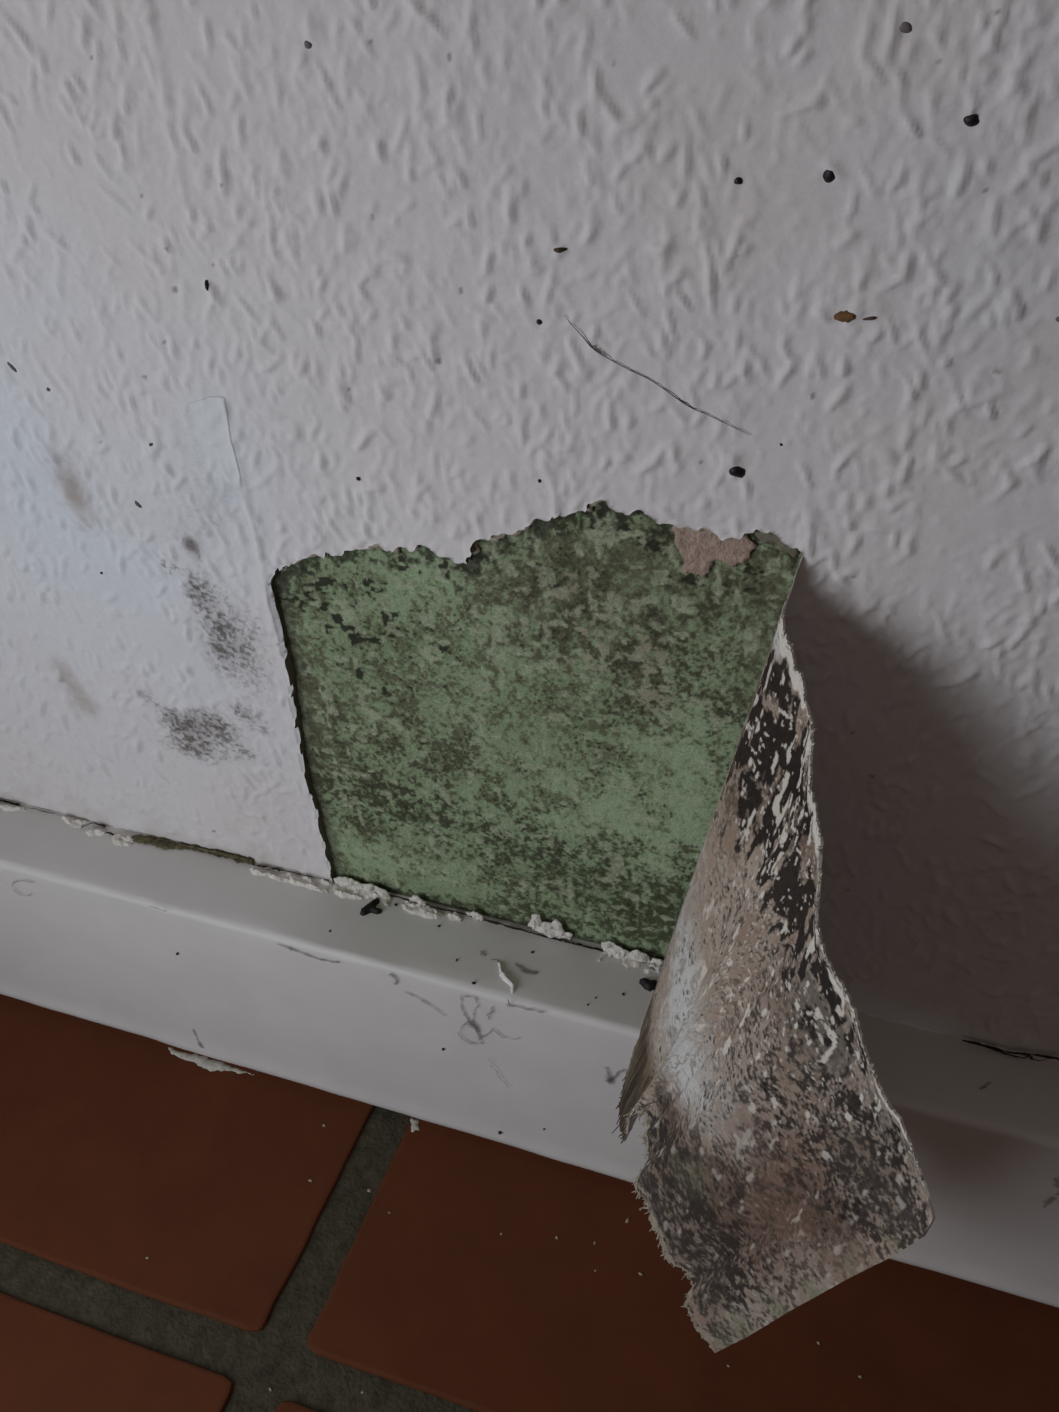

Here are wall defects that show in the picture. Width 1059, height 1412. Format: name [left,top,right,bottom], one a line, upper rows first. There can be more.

damp [189,578,252,670]
damp [165,707,238,757]
peeling [249,500,802,974]